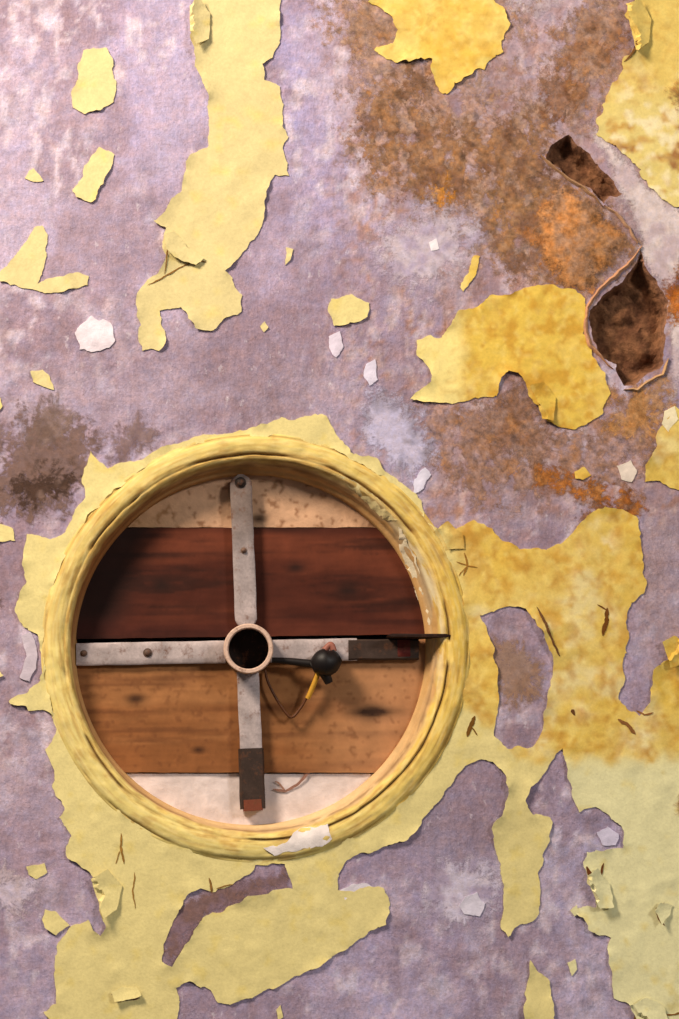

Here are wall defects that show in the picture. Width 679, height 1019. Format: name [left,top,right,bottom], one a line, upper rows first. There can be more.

peeling [368,0,510,94]
peeling [136,0,289,351]
corrosion [311,0,643,301]
flaking render [75,316,115,352]
flaking render [329,331,344,357]
flaking render [363,360,378,386]
peeling [411,135,669,430]
corrosion [663,265,679,327]
leakage [0,394,159,524]
corrosion [401,372,677,521]
peeling [9,406,679,1019]